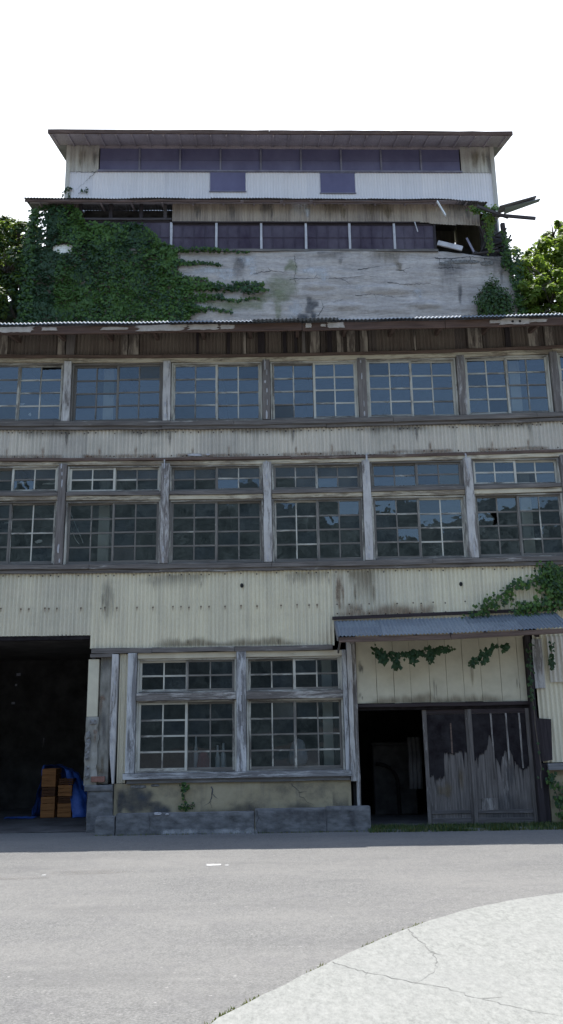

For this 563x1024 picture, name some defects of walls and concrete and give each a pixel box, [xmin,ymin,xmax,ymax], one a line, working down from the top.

crack [253,256,493,316]
peeling [427,713,529,782]
leakage [118,789,170,813]